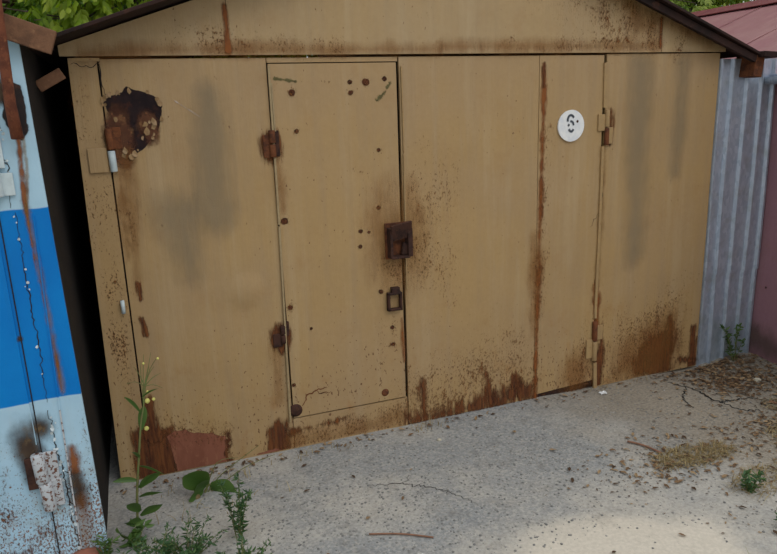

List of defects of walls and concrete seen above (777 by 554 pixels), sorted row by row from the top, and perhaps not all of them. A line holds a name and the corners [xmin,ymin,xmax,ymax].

corrosion [197,3,245,54]
corrosion [16,139,35,261]
corrosion [383,62,554,427]
corrosion [269,323,292,355]
corrosion [573,285,697,386]
corrosion [69,445,94,506]
corrosion [130,395,177,479]
corrosion [266,415,367,450]